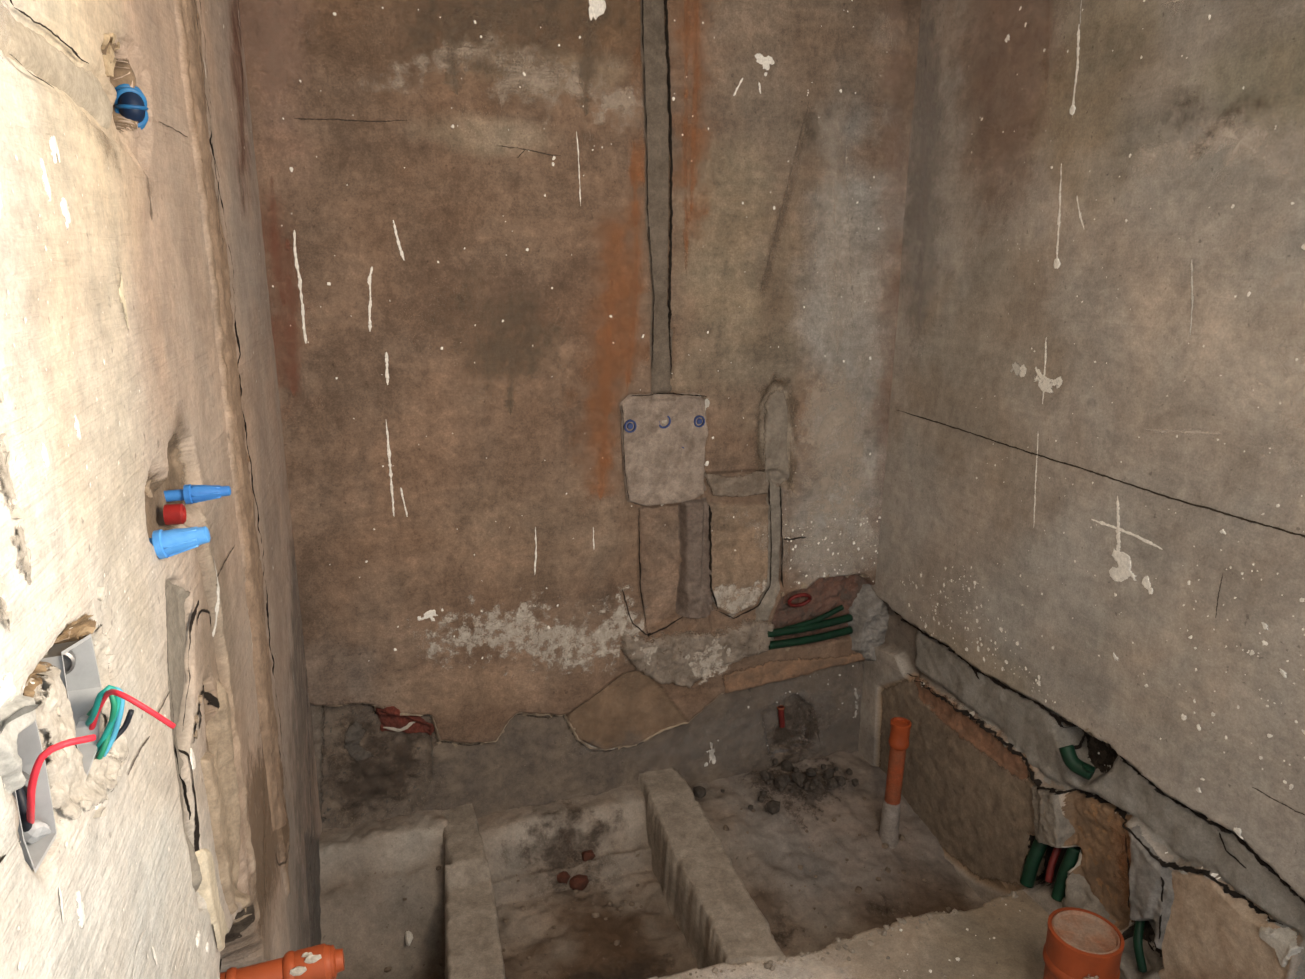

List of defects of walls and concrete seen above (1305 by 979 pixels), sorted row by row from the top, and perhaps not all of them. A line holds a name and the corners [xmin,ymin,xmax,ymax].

crack [10,0,89,64]
spalling [319,660,865,829]
spalling [772,574,873,651]
crack [886,603,1086,750]
spalling [879,676,1164,968]
crack [909,674,1305,939]
spalling [225,904,255,943]
peeling [1259,926,1304,969]